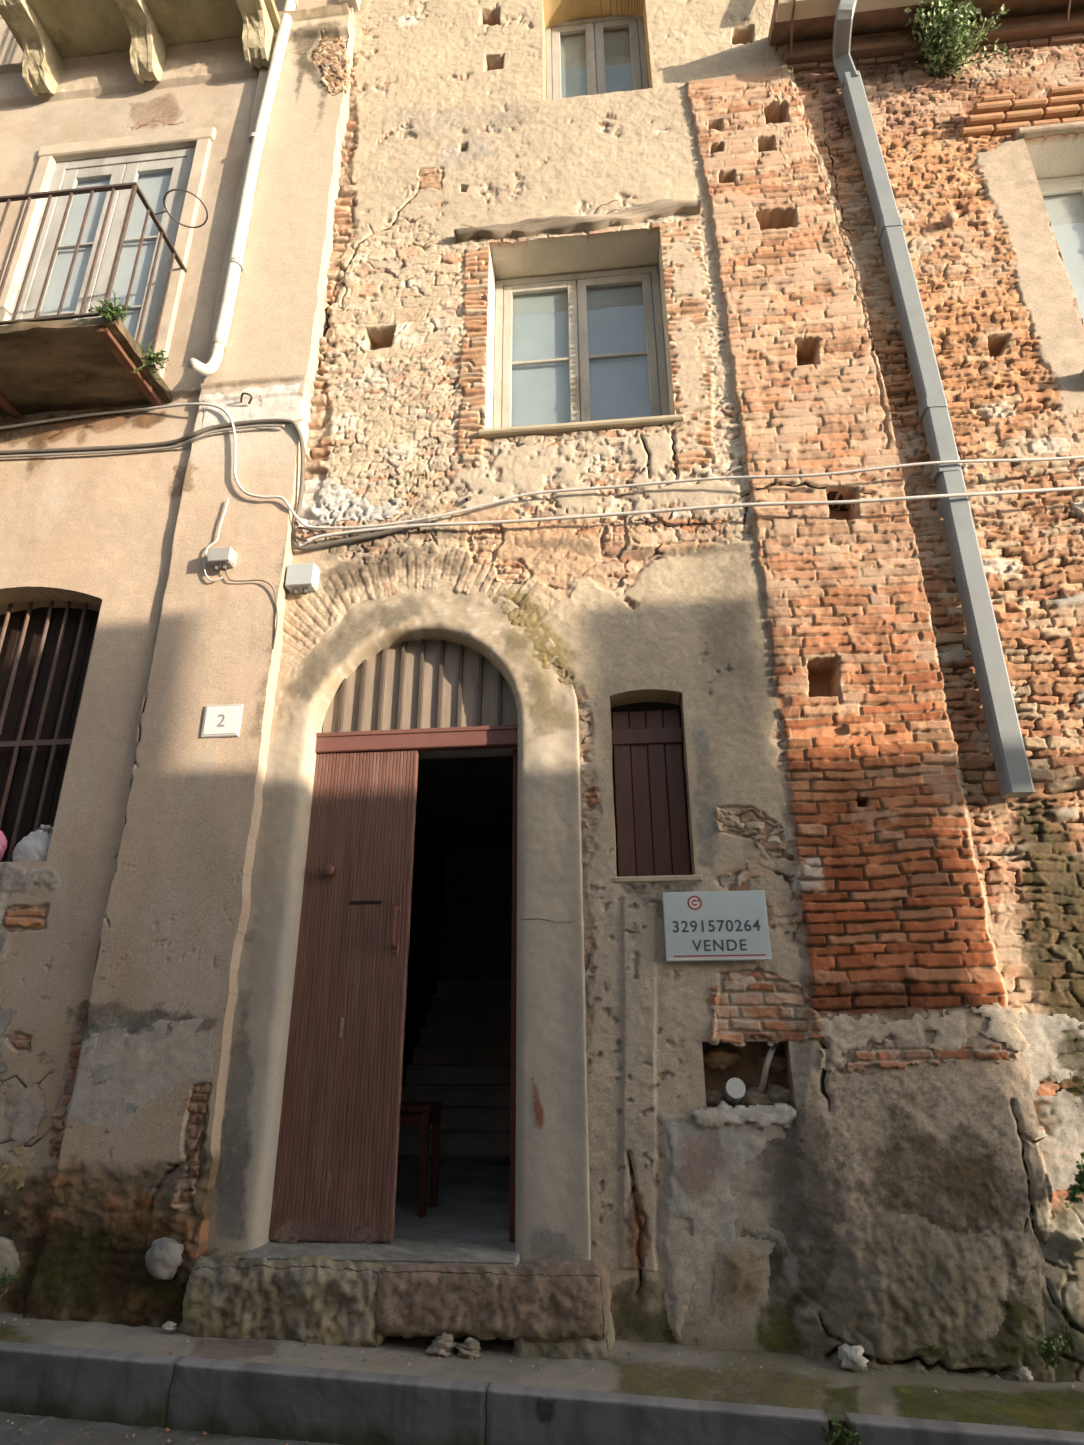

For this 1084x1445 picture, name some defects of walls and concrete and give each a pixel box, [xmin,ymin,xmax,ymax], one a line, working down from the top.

flaking render [311,29,351,96]
flaking render [5,904,47,931]
damp [1013,802,1084,1030]
flaking render [48,1003,214,1213]
peeling [0,1142,28,1216]
crack [1014,1113,1047,1241]
crack [1047,1286,1084,1342]